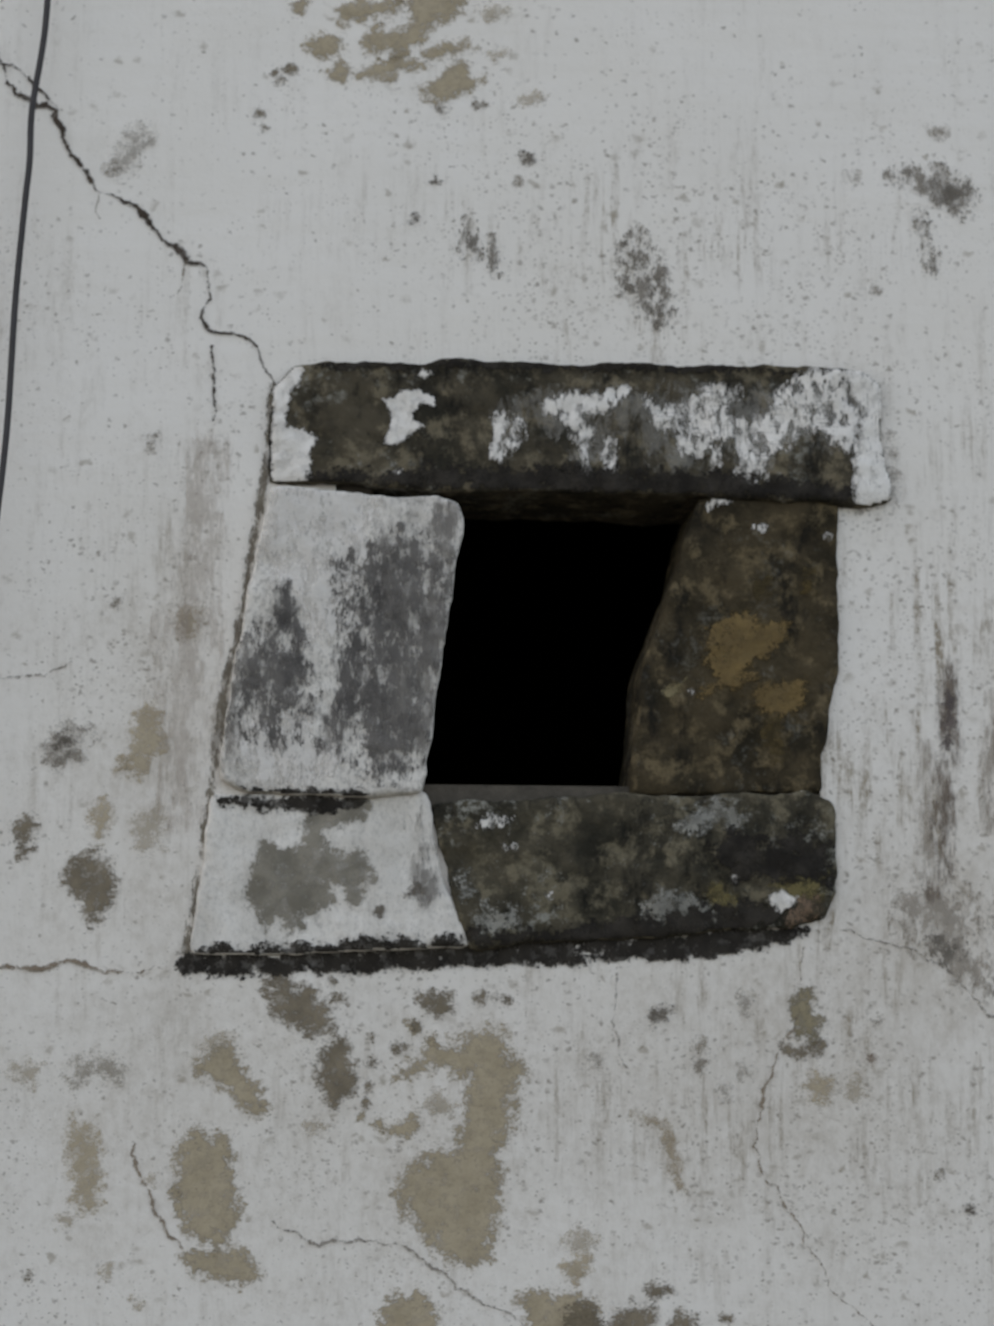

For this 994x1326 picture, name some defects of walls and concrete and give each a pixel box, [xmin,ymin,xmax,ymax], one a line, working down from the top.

peeling [270,63,298,87]
peeling [291,0,311,16]
peeling [300,0,506,114]
crack [0,60,275,974]
crack [843,929,994,1018]
peeling [259,973,529,1268]
crack [752,947,873,1326]
peeling [130,1127,263,1293]
crack [272,1221,523,1325]